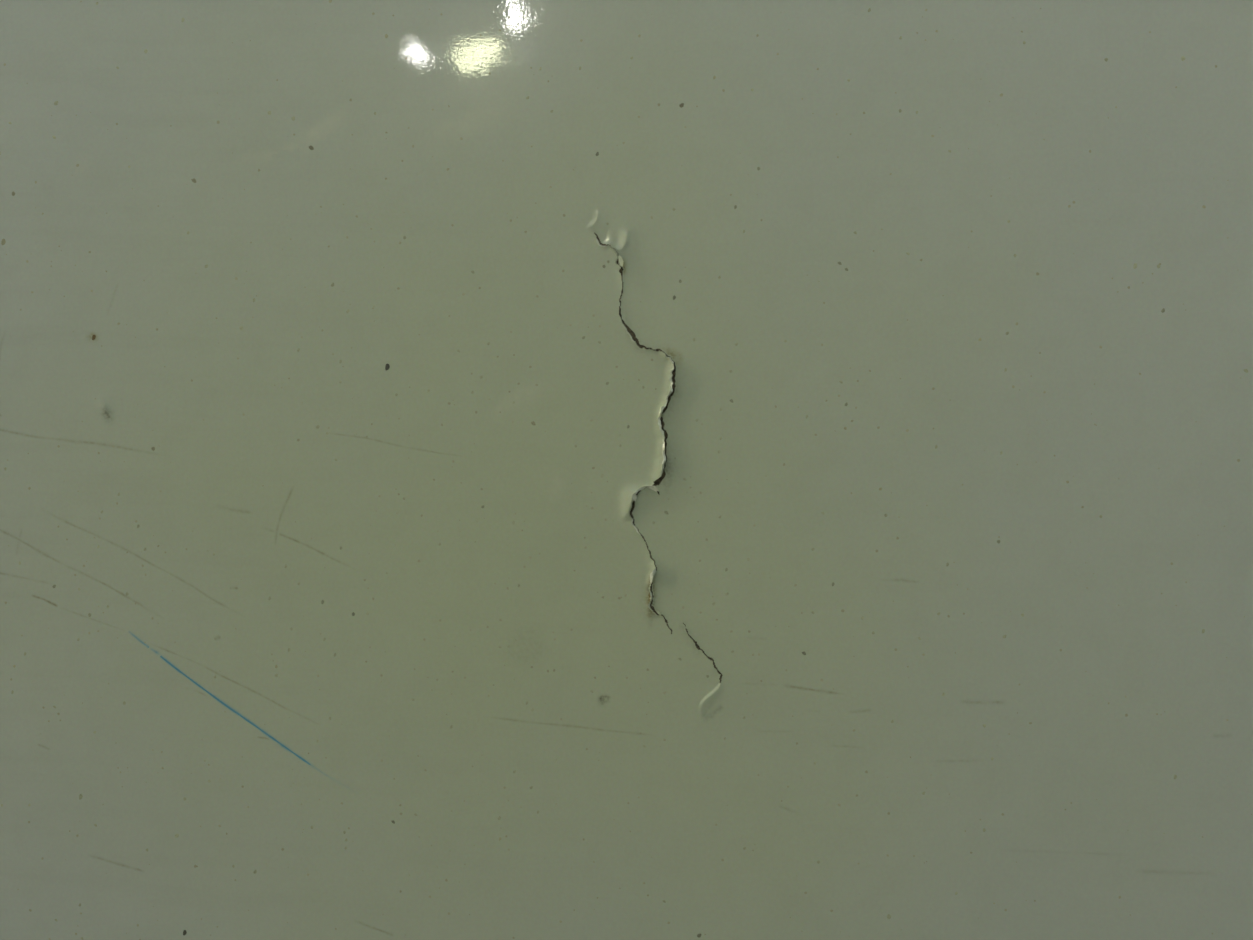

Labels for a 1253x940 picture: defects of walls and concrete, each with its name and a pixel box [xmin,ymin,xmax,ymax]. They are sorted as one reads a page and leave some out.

crack [576,213,742,728]